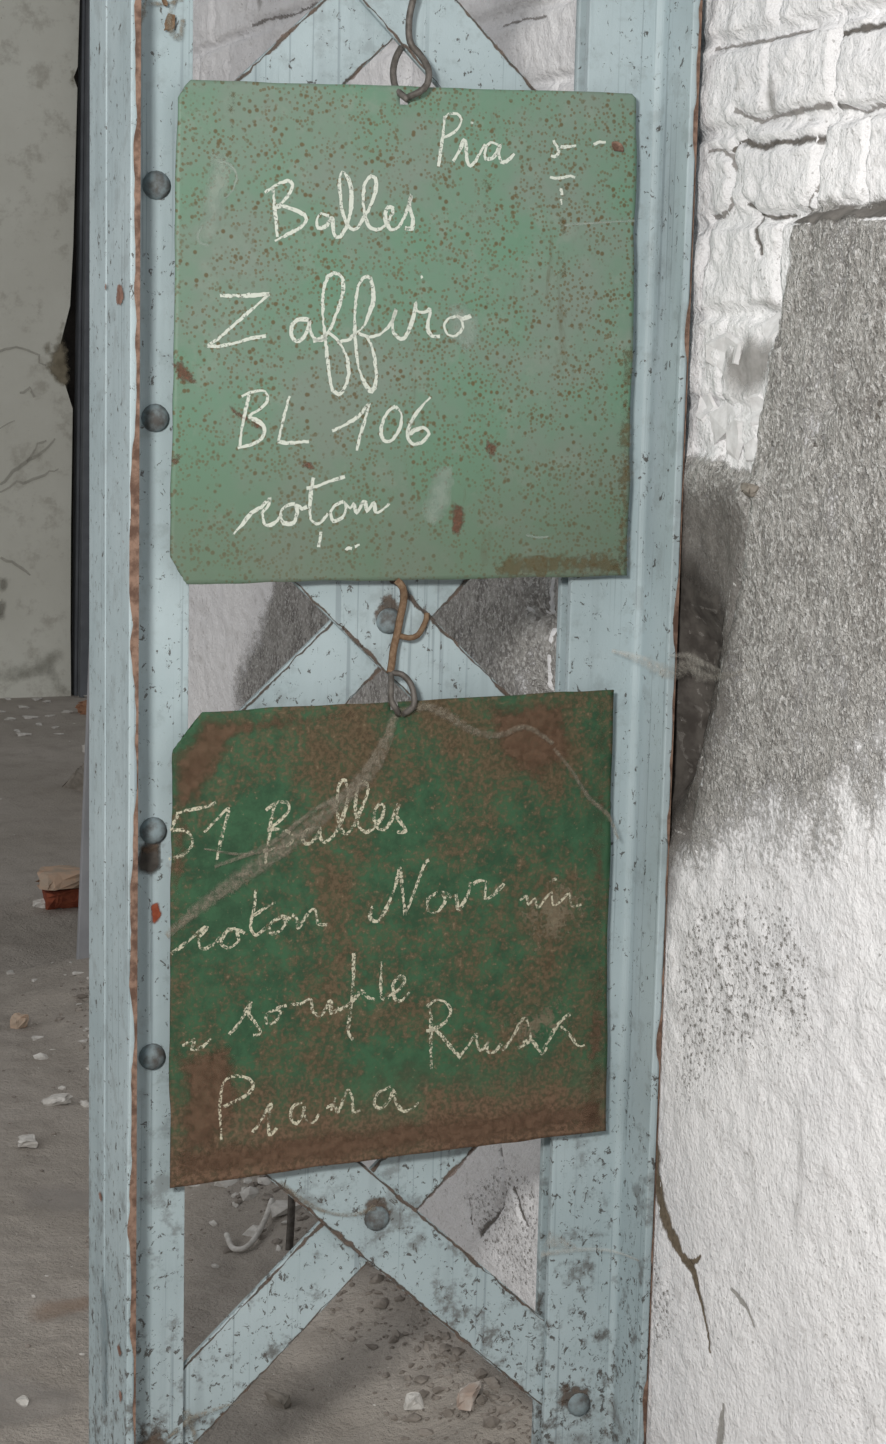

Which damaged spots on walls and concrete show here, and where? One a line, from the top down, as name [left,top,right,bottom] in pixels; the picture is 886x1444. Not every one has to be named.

corrosion [105,0,593,1444]
crack [656,1144,755,1353]
crack [716,1403,724,1444]